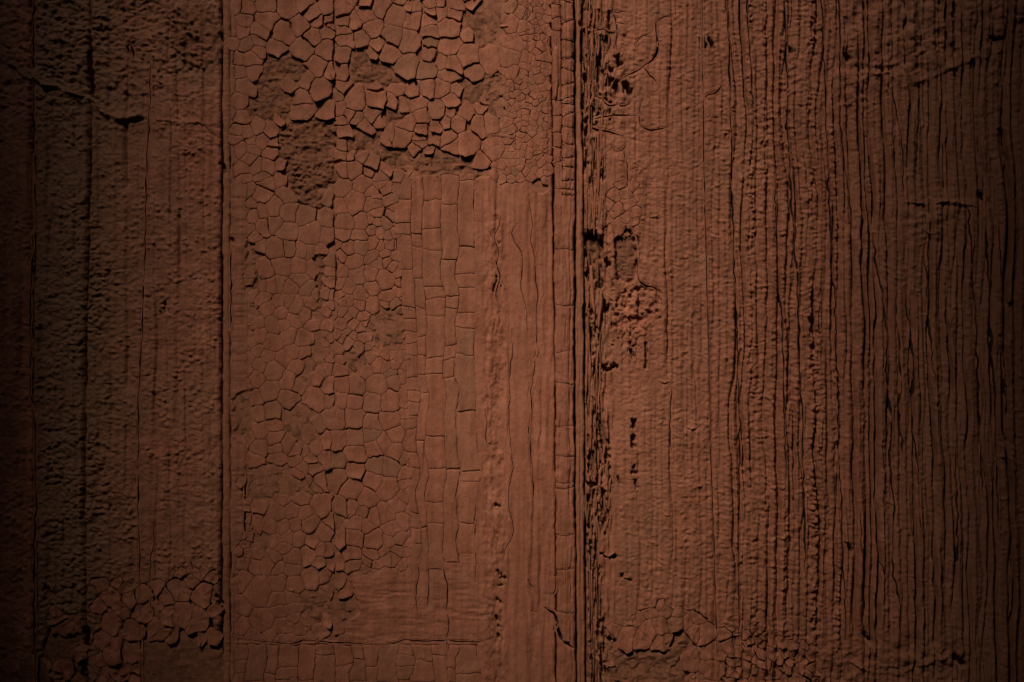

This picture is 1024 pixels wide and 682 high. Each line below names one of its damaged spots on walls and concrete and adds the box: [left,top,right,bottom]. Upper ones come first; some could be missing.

peeling [166,0,508,211]
crack [228,0,671,682]
spalling [614,227,661,346]
crack [700,0,813,682]
crack [773,0,937,645]
crack [948,181,1006,621]